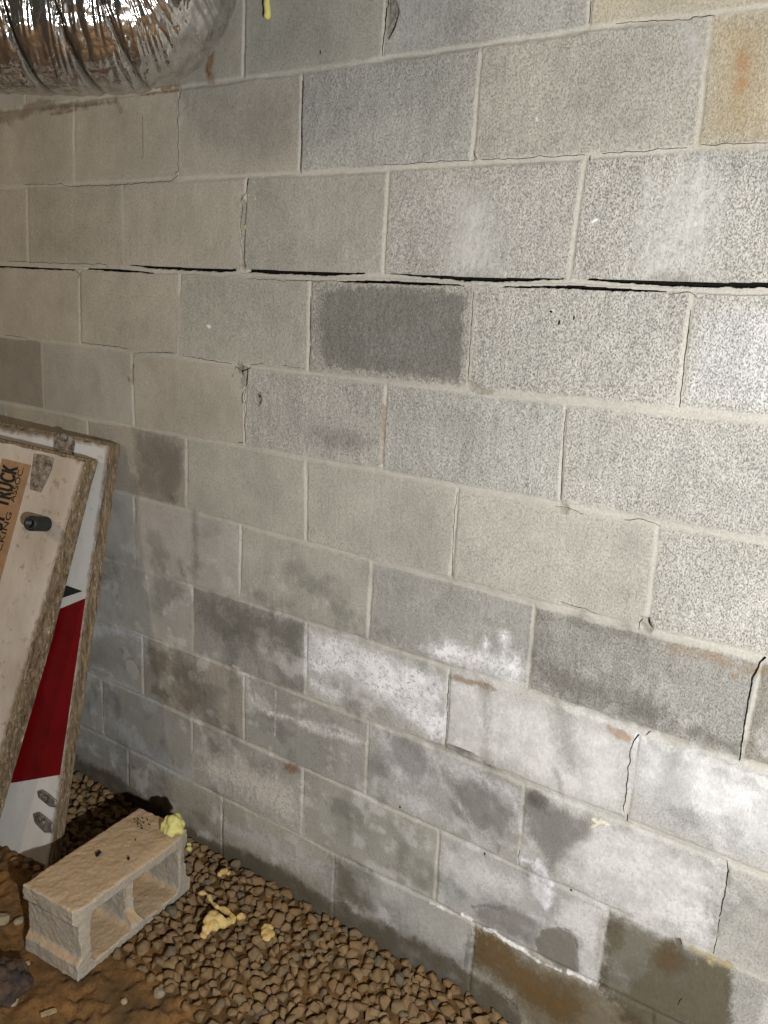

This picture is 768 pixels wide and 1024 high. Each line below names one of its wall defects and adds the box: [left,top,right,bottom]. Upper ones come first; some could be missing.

crack [0,179,768,443]
water stain [232,665,362,744]
crack [739,657,766,760]
water stain [74,758,169,818]
water stain [201,757,303,827]
water stain [303,627,768,1024]
crack [623,731,651,821]
water stain [184,827,521,1024]
crack [713,862,729,954]